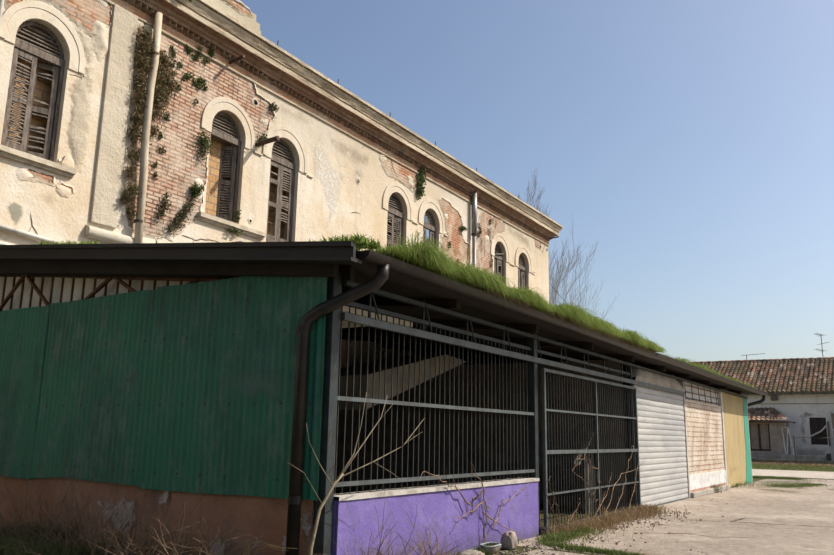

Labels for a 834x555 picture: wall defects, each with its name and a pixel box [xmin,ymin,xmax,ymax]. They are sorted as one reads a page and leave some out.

spalling [223,0,254,18]
flaking render [4,0,113,171]
spalling [17,165,76,197]
spalling [380,152,419,193]
spalling [438,196,505,275]